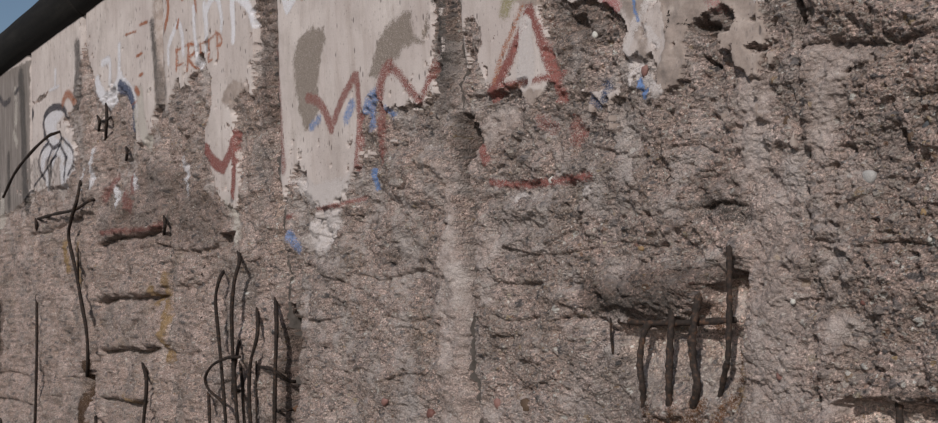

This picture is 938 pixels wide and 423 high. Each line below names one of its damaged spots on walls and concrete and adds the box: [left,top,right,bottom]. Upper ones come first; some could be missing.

spalling [0,0,304,423]
spalling [277,0,938,423]
corrosion [638,342,746,423]